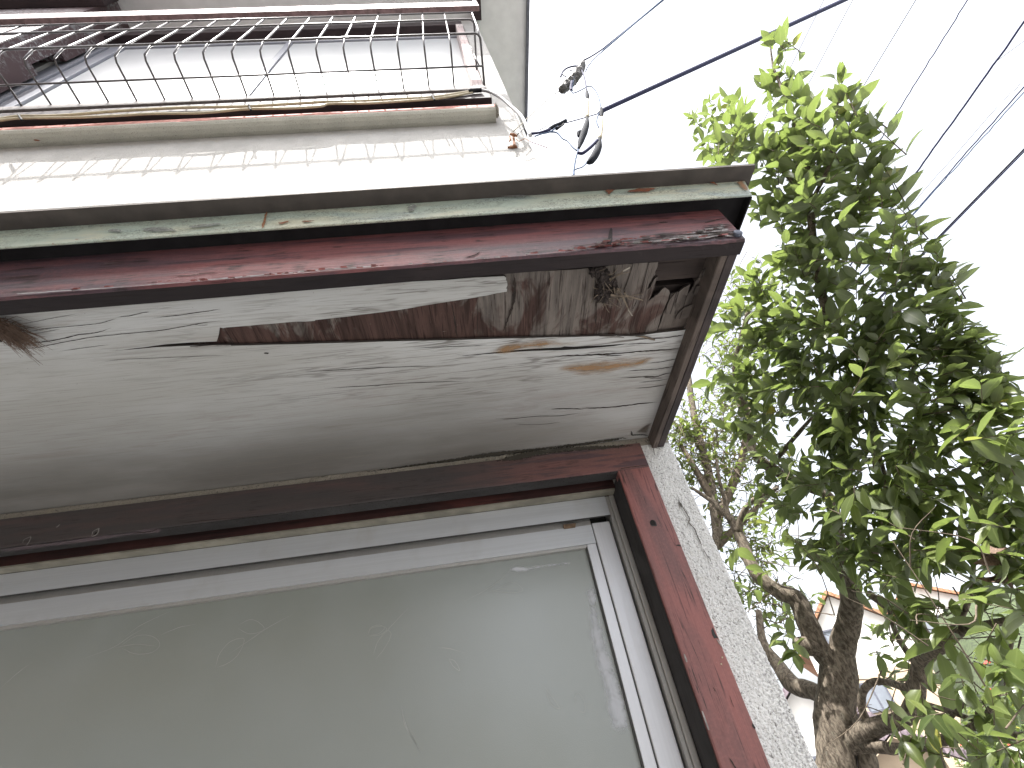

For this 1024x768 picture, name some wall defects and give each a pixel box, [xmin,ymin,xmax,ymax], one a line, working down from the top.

peeling [553,224,733,253]
peeling [17,264,384,294]
peeling [190,261,706,347]
leakage [499,342,549,352]
crack [310,345,480,388]
crack [510,335,682,425]
leakage [567,359,646,371]